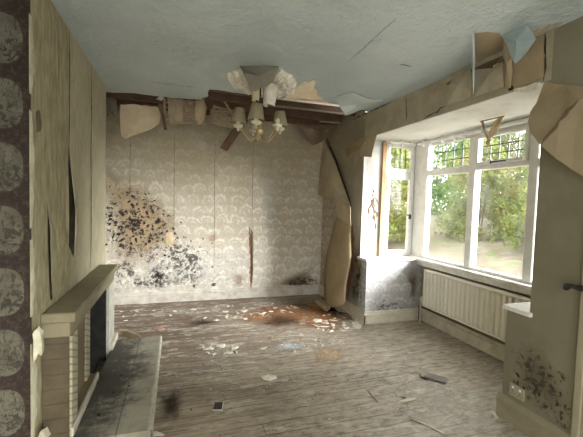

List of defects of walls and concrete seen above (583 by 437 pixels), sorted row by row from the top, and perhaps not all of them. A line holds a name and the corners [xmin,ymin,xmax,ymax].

crack [348,18,397,62]
peeling [475,32,505,64]
peeling [283,80,324,100]
peeling [513,82,540,93]
leakage [105,188,225,288]
leakage [514,349,569,429]